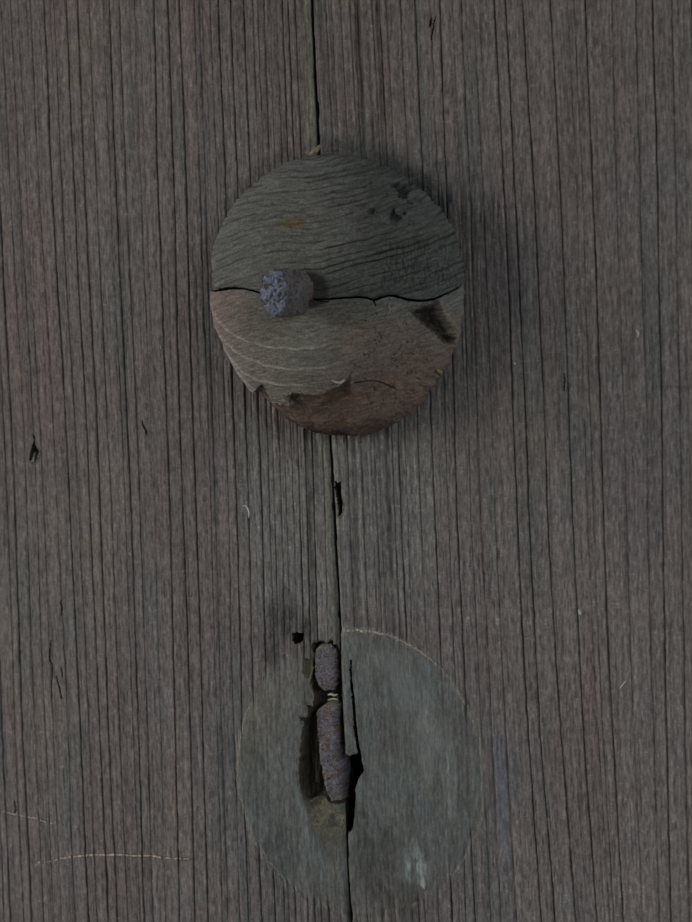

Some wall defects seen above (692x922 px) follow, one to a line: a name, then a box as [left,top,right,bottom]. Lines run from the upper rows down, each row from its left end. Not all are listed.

crack [213,286,260,294]
crack [312,284,461,306]
spalling [298,640,350,805]
rust [317,696,355,801]